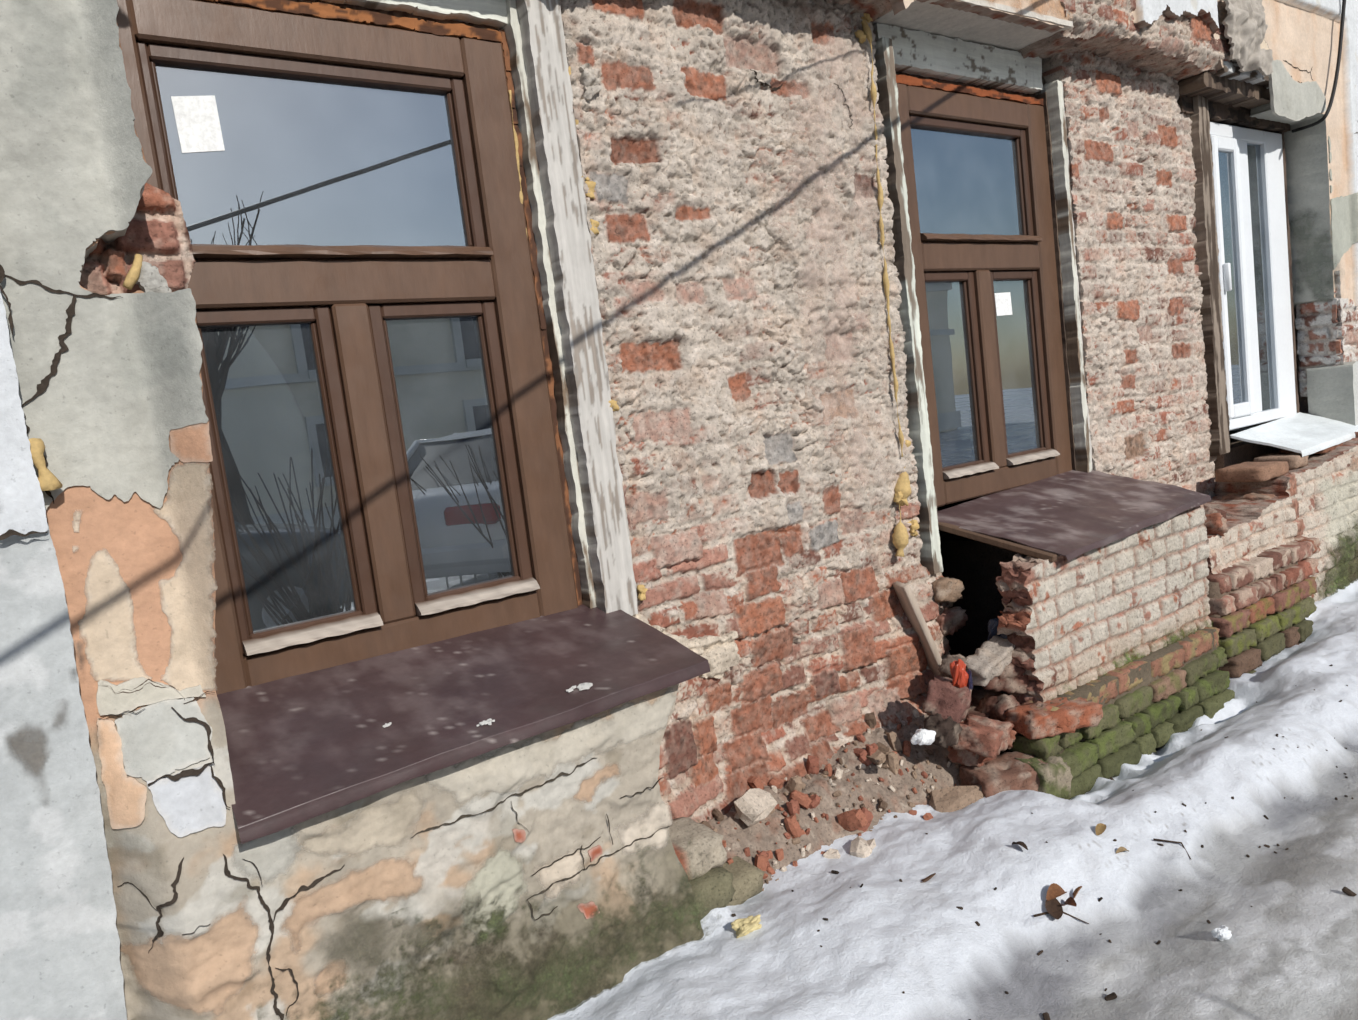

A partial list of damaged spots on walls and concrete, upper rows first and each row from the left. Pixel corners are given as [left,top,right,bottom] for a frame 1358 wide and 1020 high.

spalling [79,183,196,295]
spalling [1018,0,1234,498]
crack [0,265,123,540]
spalling [427,0,953,853]
spalling [1295,270,1358,397]
peeling [78,422,218,698]
crack [117,857,210,953]
crack [223,854,345,1020]
peeling [234,792,424,952]
crack [411,758,594,838]
peeling [463,828,603,940]
crack [527,777,670,920]